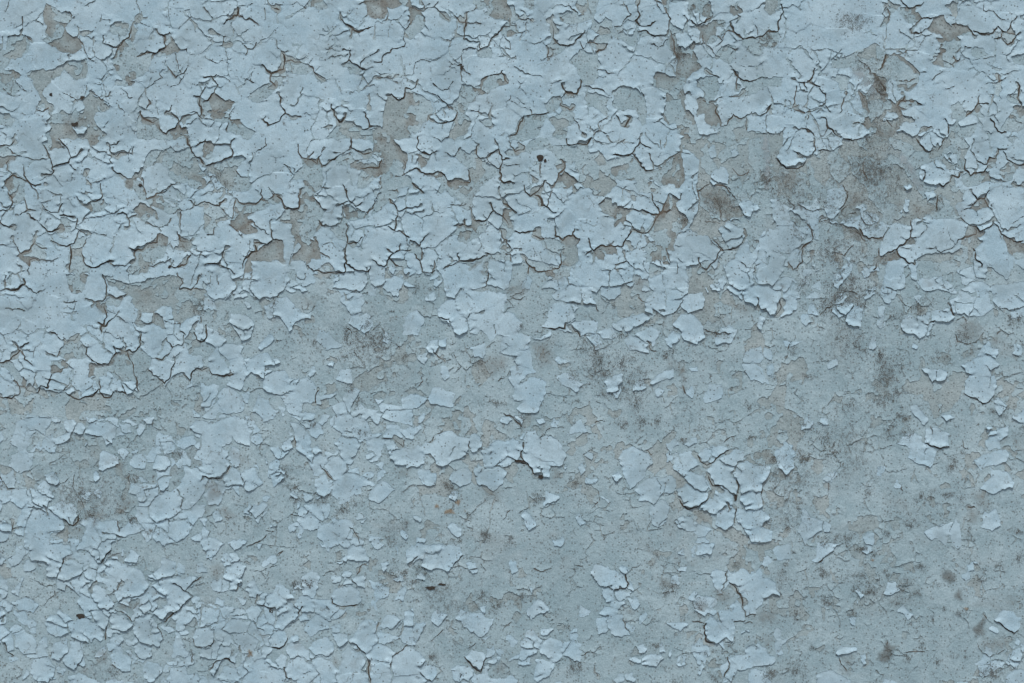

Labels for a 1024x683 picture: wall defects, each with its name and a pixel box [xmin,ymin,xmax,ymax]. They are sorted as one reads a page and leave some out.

peeling [0,0,821,506]
crack [0,0,1024,400]
peeling [669,0,1024,338]
crack [90,522,133,640]
peeling [0,383,437,683]
peeling [396,522,478,590]
peeling [451,606,582,683]
peeling [579,563,647,637]
peeling [612,437,796,683]
crack [647,435,764,523]
peeling [898,404,954,467]
peeling [961,341,1024,494]